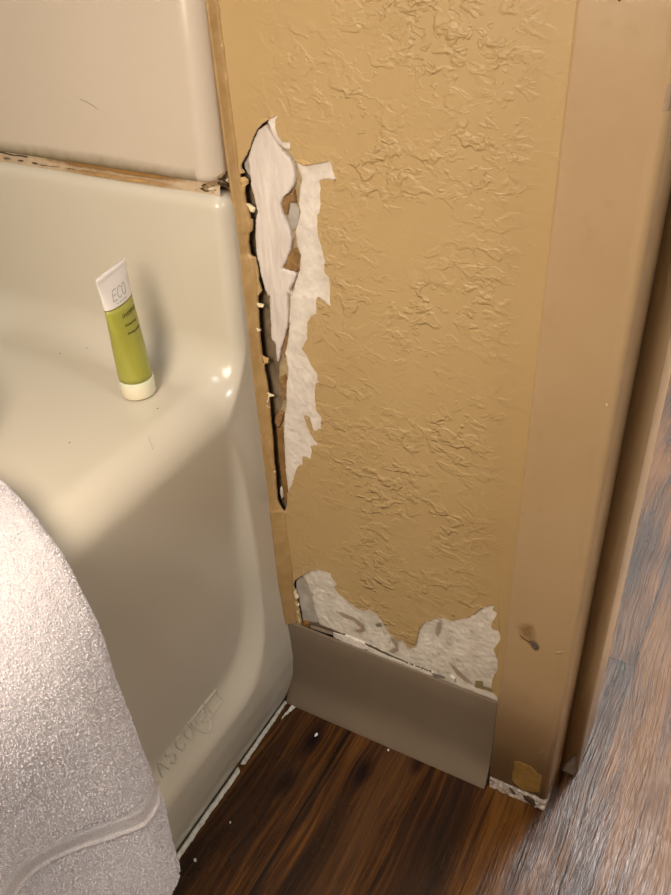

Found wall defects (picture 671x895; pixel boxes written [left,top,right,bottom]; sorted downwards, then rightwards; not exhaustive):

flaking render [239,115,336,510]
flaking render [294,569,501,701]